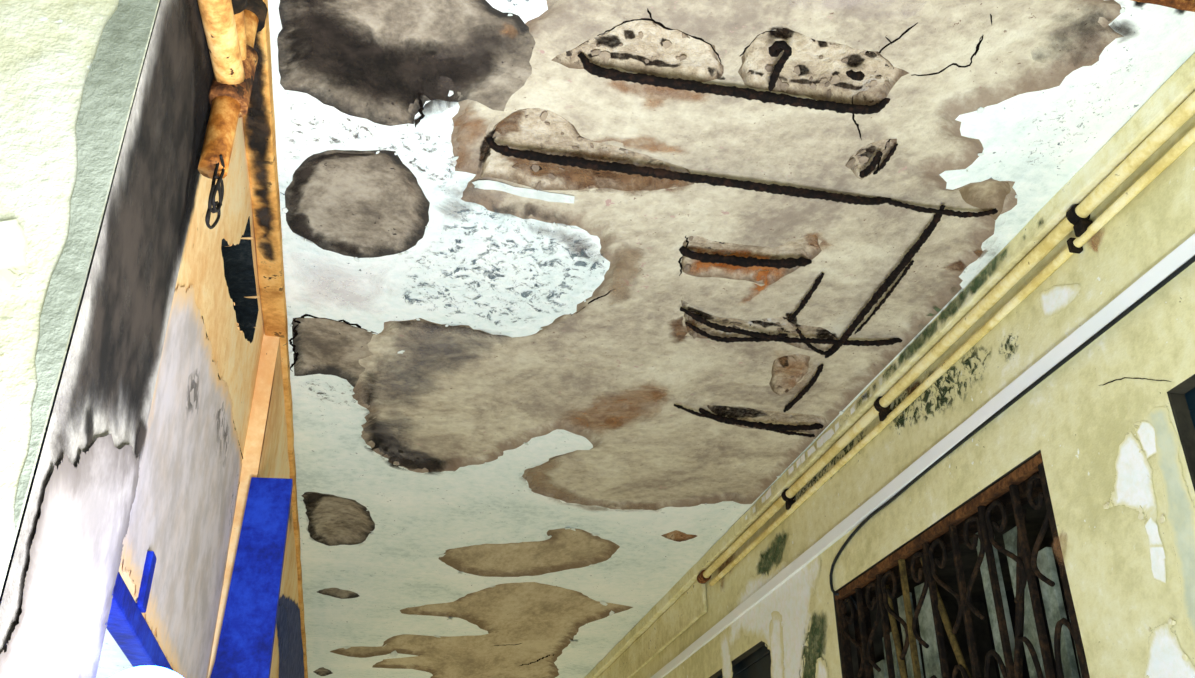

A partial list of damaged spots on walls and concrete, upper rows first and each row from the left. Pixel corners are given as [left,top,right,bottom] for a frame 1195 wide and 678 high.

crack [865,22,918,53]
crack [911,14,992,76]
water stain [286,0,502,255]
water stain [70,0,212,460]
spalling [221,216,260,344]
spalling [277,0,1125,521]
rust [693,248,780,301]
water stain [858,249,1007,404]
water stain [892,335,1018,434]
peeling [1103,405,1195,678]